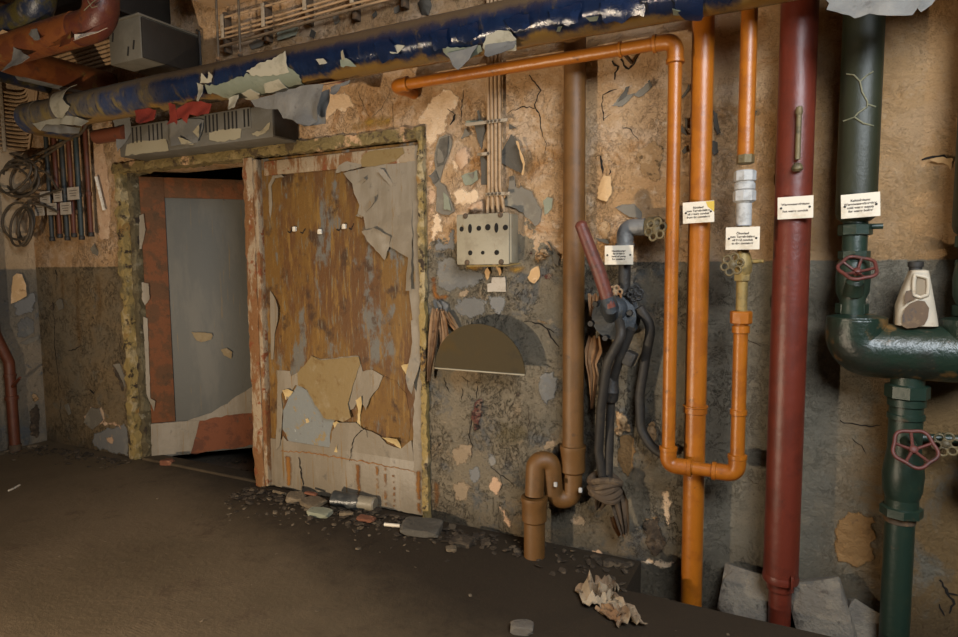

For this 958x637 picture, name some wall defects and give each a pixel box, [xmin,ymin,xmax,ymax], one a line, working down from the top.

peeling [268,174,284,218]
peeling [502,124,553,226]
peeling [11,274,39,345]
corrosion [139,177,244,423]
peeling [270,291,278,359]
peeling [276,89,509,503]
flaking render [834,512,876,567]